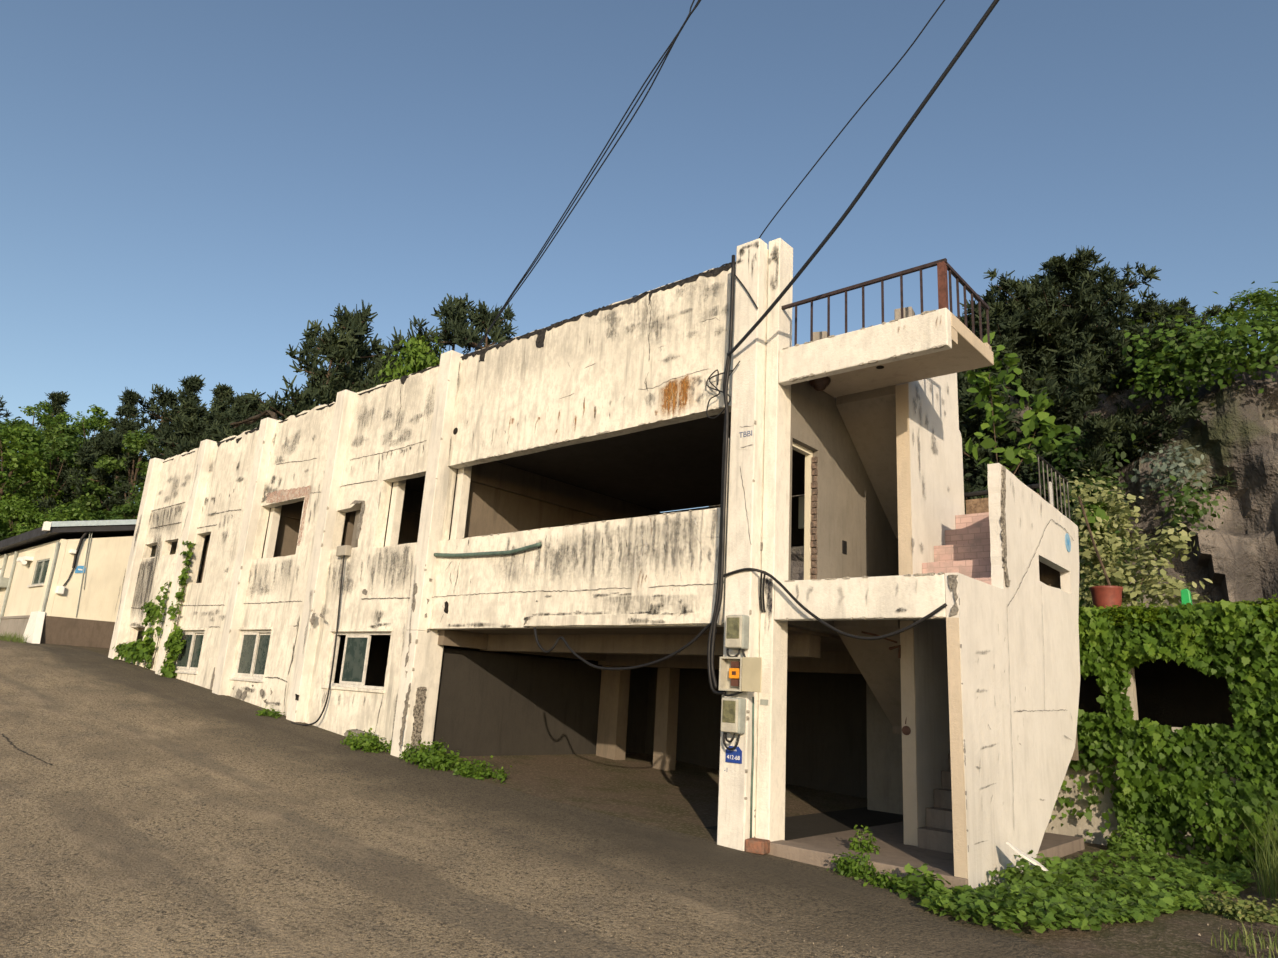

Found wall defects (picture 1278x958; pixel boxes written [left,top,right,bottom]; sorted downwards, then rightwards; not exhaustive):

rust [655,376,689,414]
leakage [354,402,431,461]
leakage [507,511,717,624]